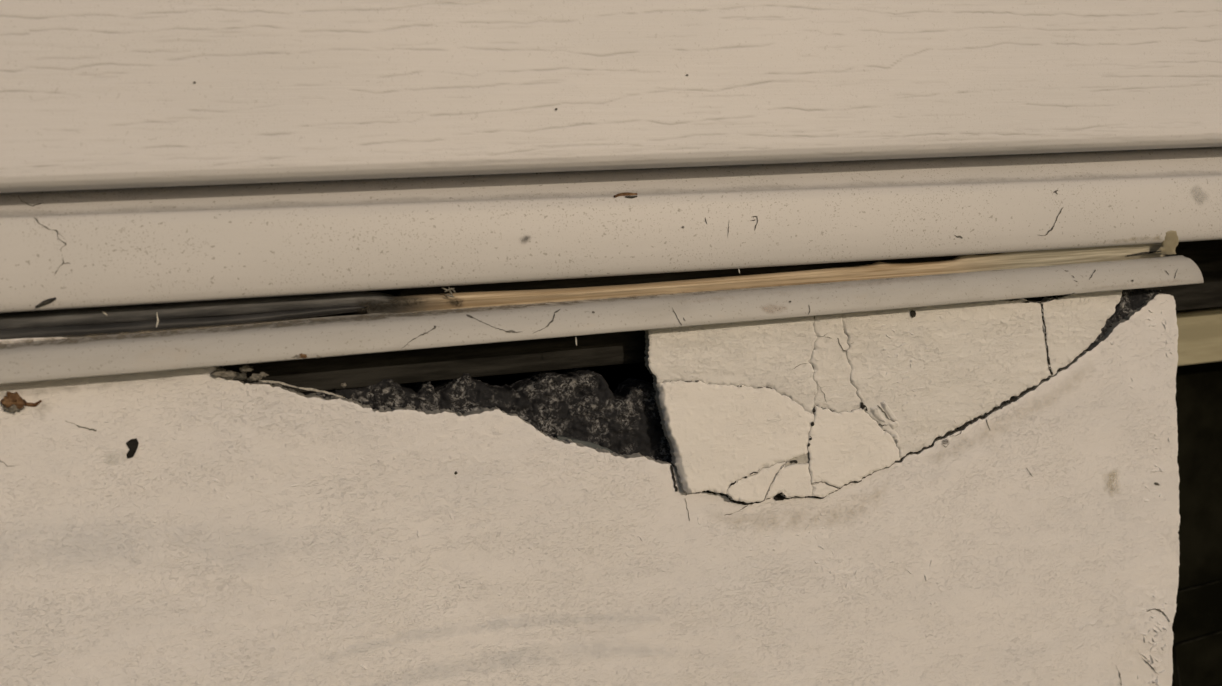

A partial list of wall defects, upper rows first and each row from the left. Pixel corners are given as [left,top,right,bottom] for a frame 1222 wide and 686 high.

spalling [211,365,674,467]
crack [670,290,1161,521]